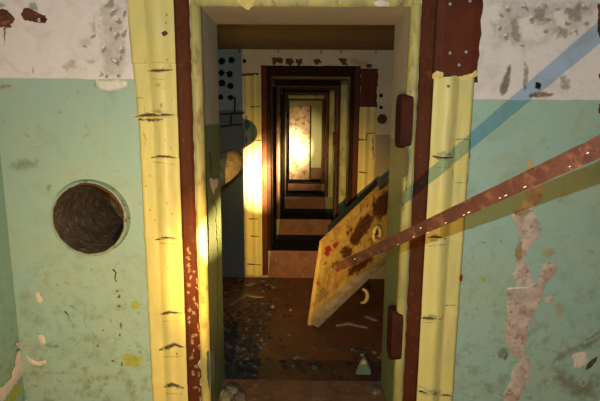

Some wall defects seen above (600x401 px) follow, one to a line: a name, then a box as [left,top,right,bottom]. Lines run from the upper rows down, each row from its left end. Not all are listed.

peeling [0,342,47,401]
peeling [185,246,215,401]
peeling [503,184,558,401]